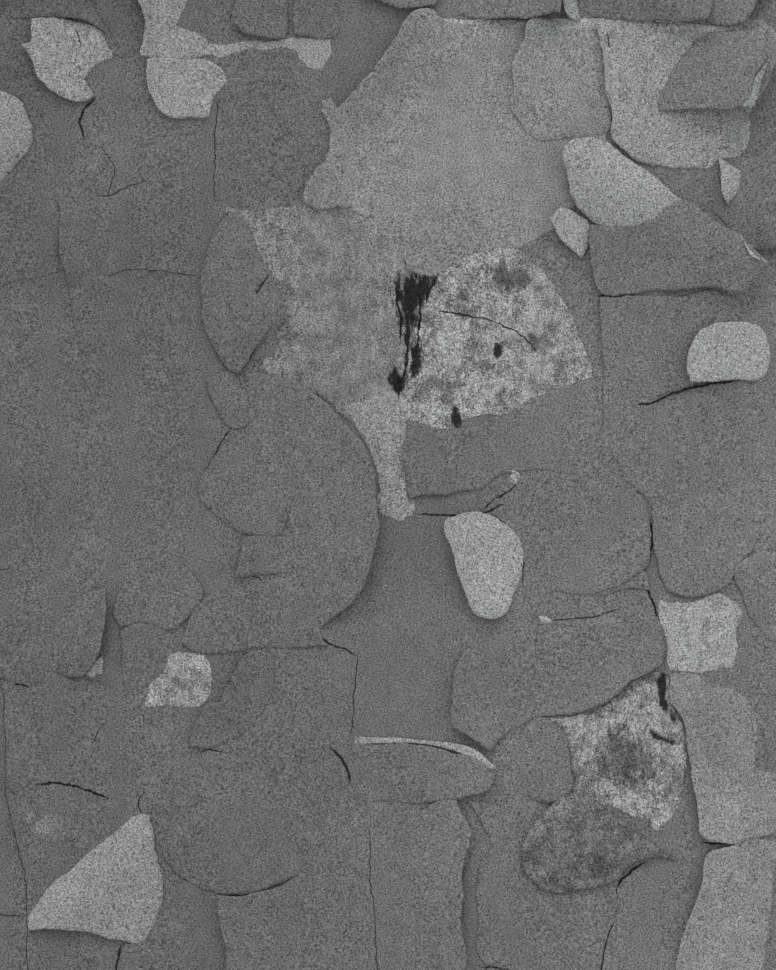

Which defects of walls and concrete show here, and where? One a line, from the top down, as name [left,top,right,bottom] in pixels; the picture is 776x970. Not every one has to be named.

peeling [0,91,60,287]
peeling [112,201,422,708]
peeling [301,0,776,970]
crack [0,680,109,970]
peeling [28,743,309,970]